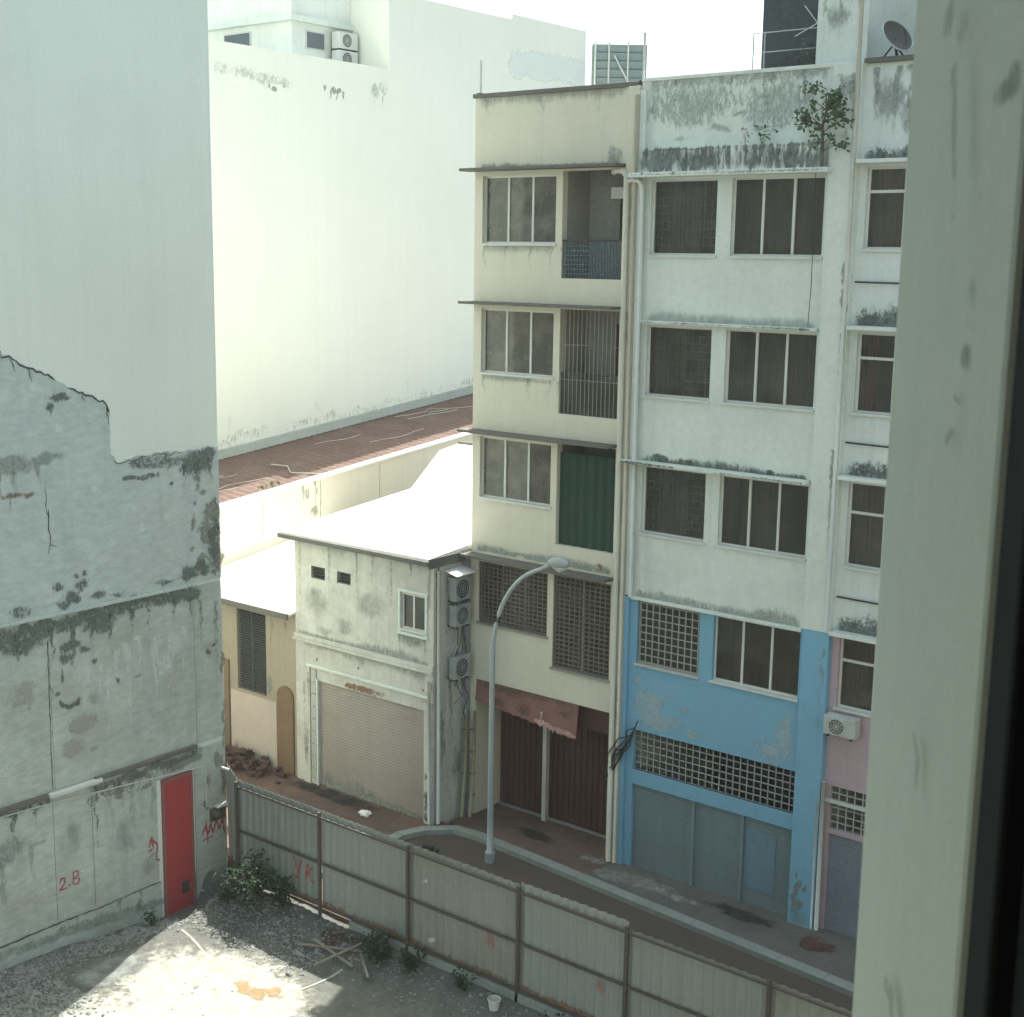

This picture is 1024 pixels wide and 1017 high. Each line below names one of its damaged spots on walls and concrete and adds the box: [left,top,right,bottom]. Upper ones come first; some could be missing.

leakage [874,65,913,129]
leakage [639,142,823,175]
leakage [865,146,908,159]
flaking render [0,354,225,625]
crack [45,492,57,553]
leakage [0,519,220,665]
corrosion [345,683,380,695]